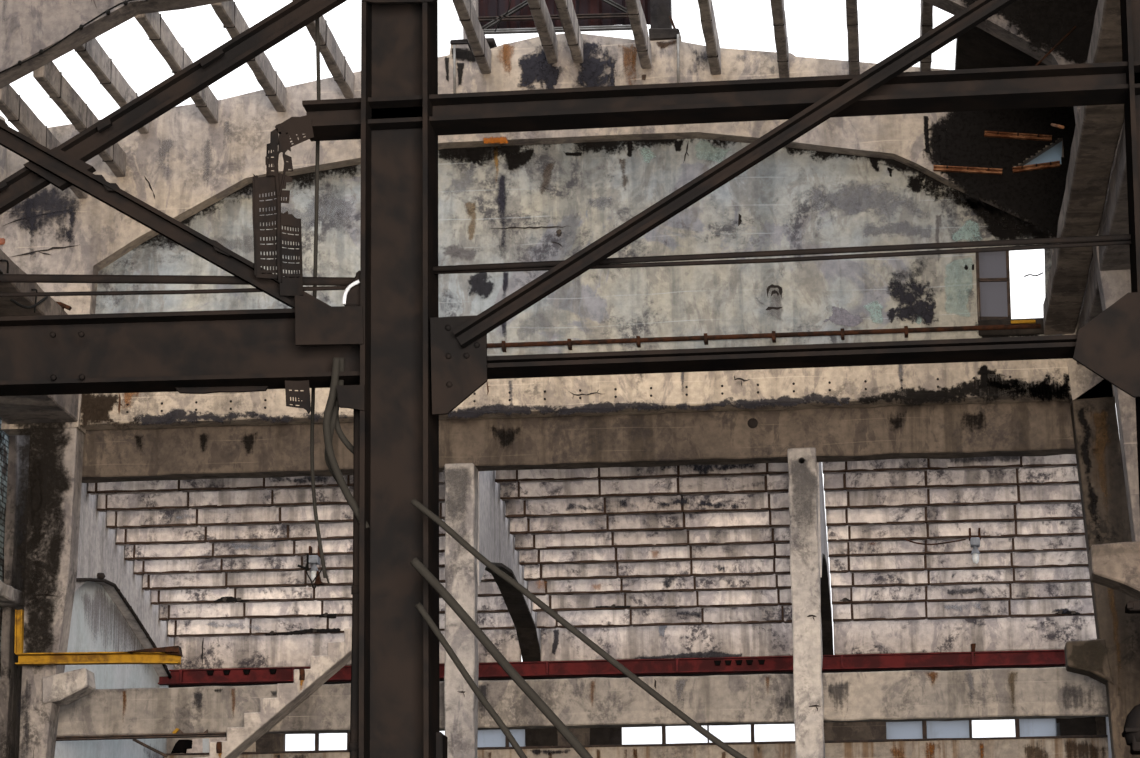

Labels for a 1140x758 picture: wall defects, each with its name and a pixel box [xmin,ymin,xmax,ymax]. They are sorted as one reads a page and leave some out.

water stain [518,46,561,90]
water stain [573,40,616,87]
water stain [923,116,949,175]
water stain [9,188,79,255]
water stain [811,157,941,325]
water stain [448,364,1071,447]